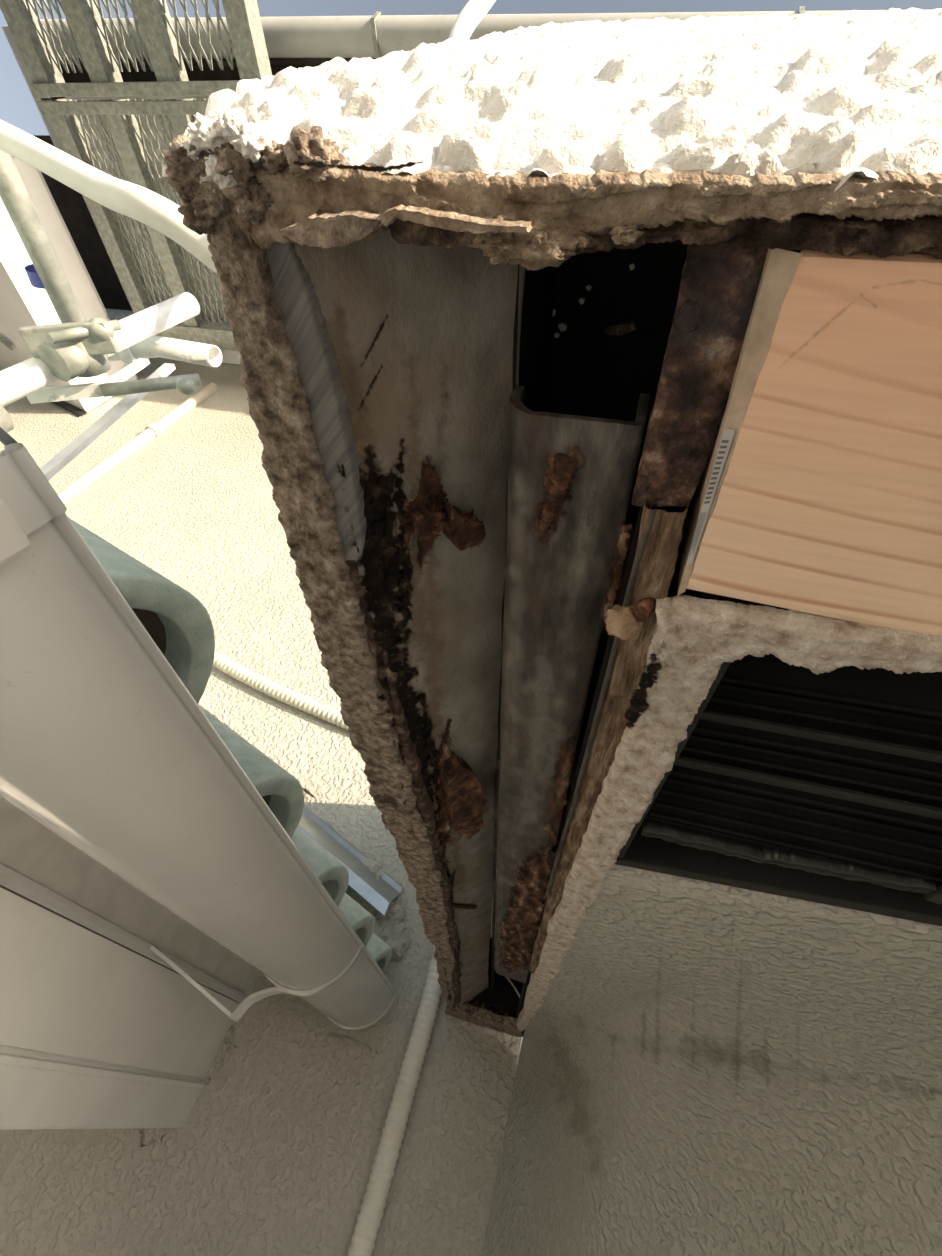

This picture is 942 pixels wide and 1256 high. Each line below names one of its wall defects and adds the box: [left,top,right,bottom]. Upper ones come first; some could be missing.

spalling [162,108,345,235]
crack [293,161,423,172]
spalling [608,223,688,246]
spalling [278,205,593,412]
rust [399,456,486,568]
rust [602,524,630,626]
spalling [613,479,650,607]
rust [435,733,488,860]
spalling [491,475,508,990]
rust [495,732,576,973]
spalling [554,617,615,853]